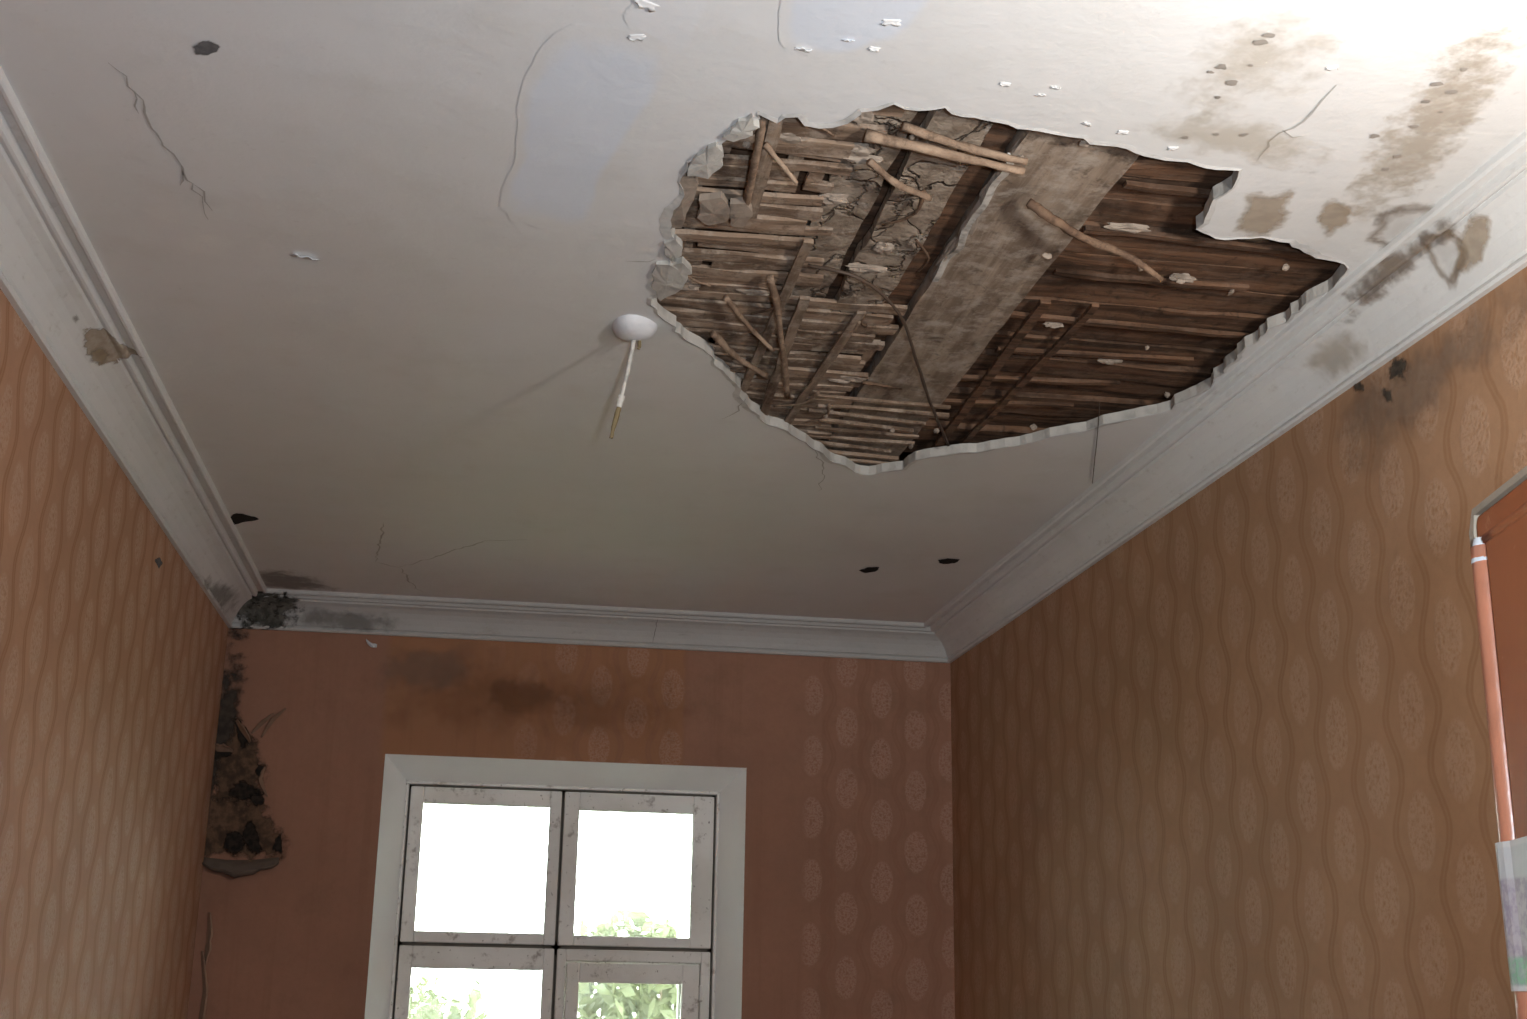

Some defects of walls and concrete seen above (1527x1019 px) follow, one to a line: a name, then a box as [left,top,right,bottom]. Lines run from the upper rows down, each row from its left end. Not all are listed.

peeling [778,0,939,58]
leakage [1253,33,1275,46]
leakage [1208,64,1238,99]
leakage [1422,82,1458,113]
crack [110,64,212,219]
spalling [646,102,1350,475]
leakage [1354,217,1488,303]
peeling [84,328,138,365]
flaking render [204,792,283,860]